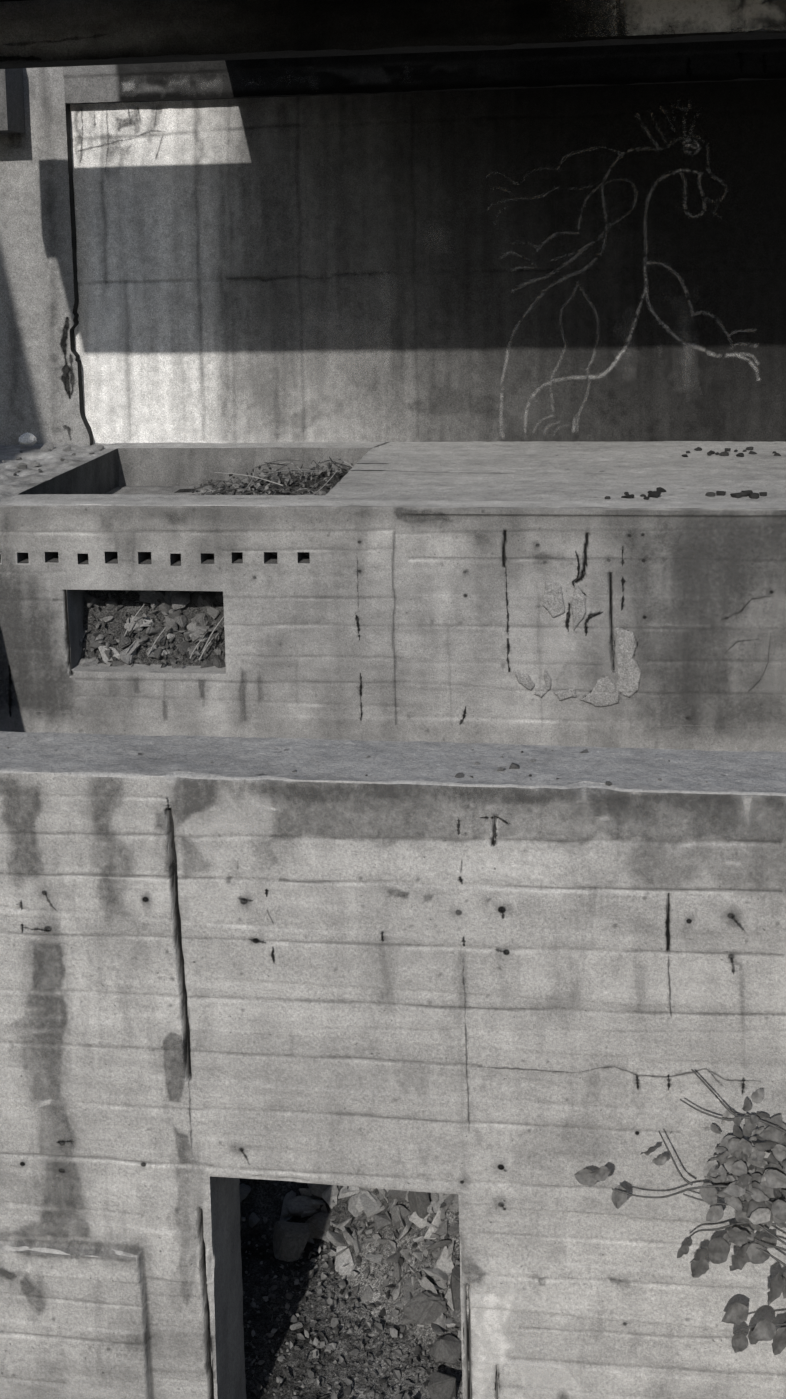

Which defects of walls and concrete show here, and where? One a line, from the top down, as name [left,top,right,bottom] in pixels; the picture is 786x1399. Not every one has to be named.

crack [502,532,510,672]
peeling [514,628,641,707]
crack [565,534,638,698]
water stain [0,778,40,876]
water stain [93,777,119,907]
crack [166,798,191,1073]
crack [663,900,671,949]
water stain [33,945,66,1071]
water stain [15,1163,139,1262]
water stain [0,1268,39,1310]
crack [200,1212,214,1399]